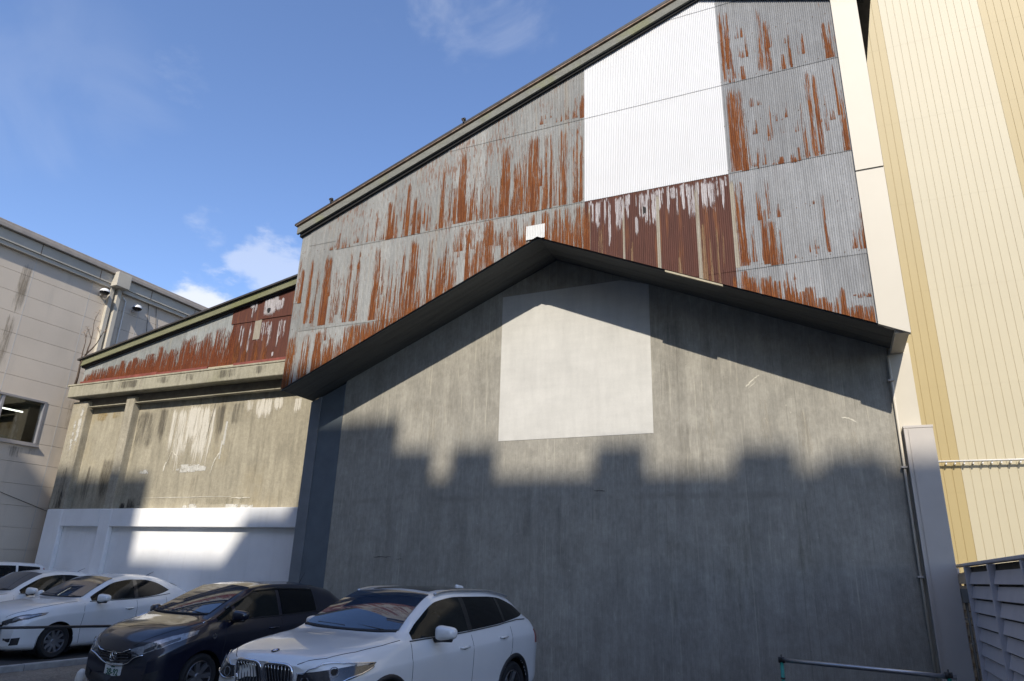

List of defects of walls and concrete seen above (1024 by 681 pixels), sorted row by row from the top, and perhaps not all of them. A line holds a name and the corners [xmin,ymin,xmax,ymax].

rust [82,99,603,390]
rust [701,12,876,322]
water stain [135,404,228,472]
efflorescence [246,397,302,418]